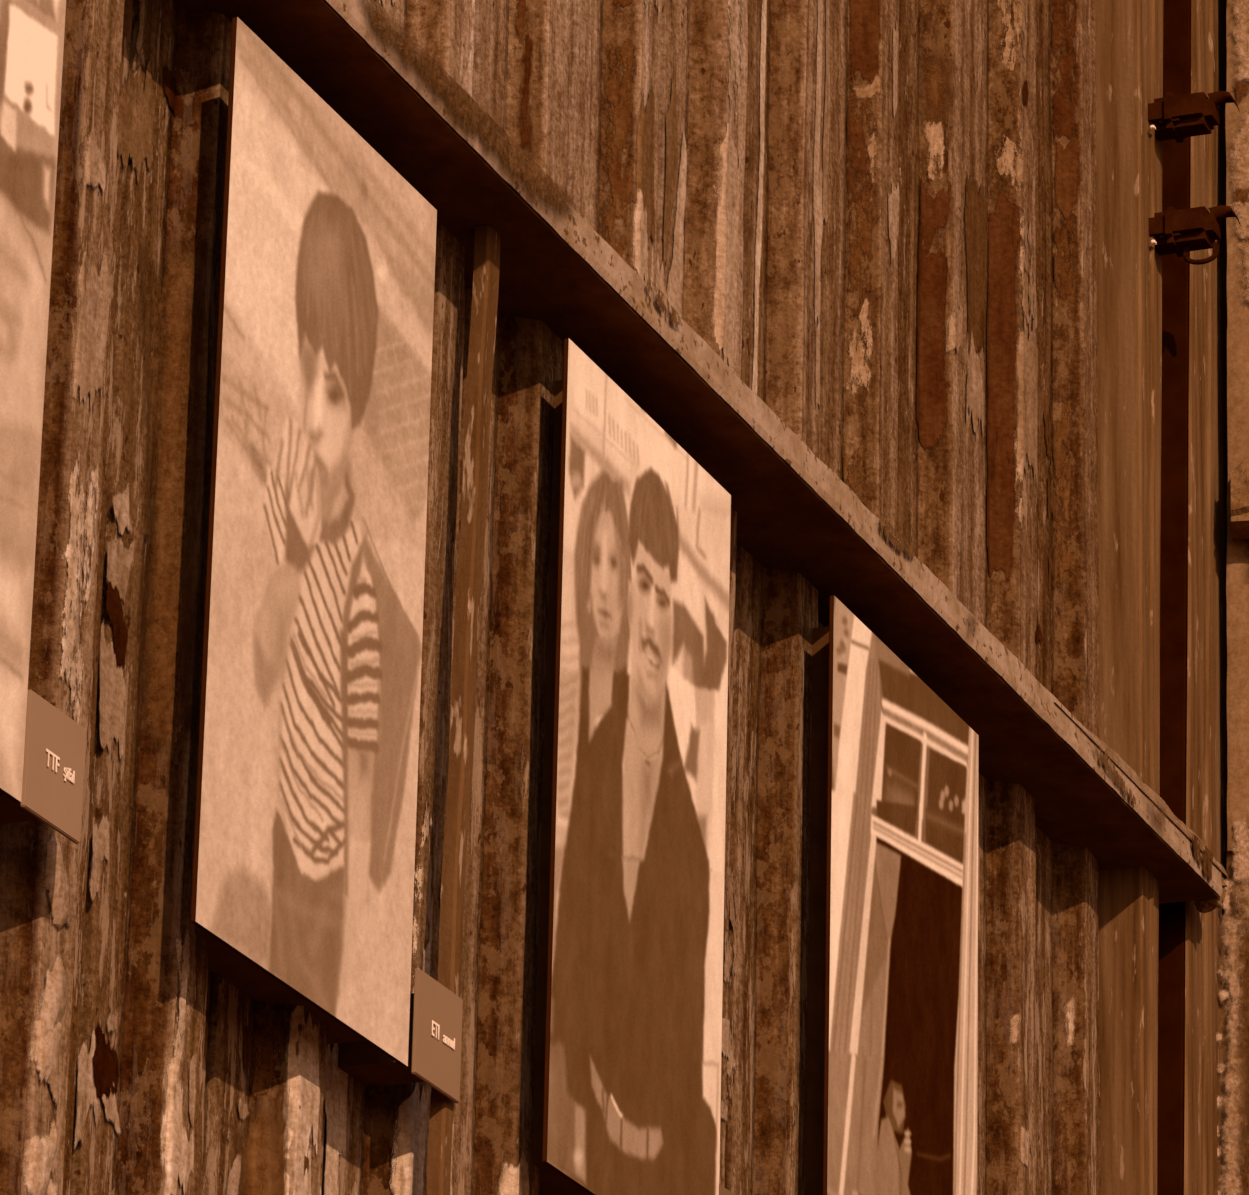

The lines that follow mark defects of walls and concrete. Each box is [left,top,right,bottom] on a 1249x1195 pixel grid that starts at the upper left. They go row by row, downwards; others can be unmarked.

peeling [633,73,687,319]
peeling [712,0,745,371]
peeling [924,120,945,182]
flaking render [1231,0,1249,302]
peeling [946,305,985,436]
peeling [1014,216,1038,527]
peeling [90,816,109,900]
peeling [74,1012,121,1147]
peeling [161,928,196,1195]
peeling [285,1005,357,1195]
peeling [391,1082,426,1195]
spalling [1216,911,1249,1195]